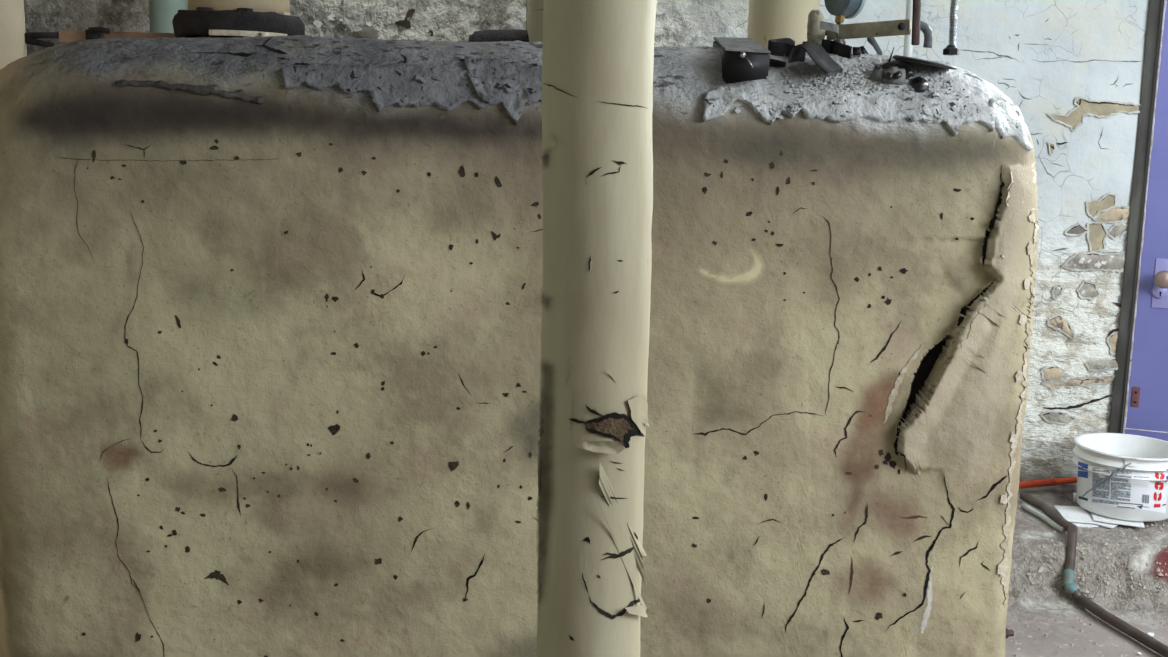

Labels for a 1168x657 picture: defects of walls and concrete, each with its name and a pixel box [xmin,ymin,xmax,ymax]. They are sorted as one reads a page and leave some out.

crack [69,145,269,261]
damp [26,101,324,131]
peeling [263,7,543,124]
crack [544,83,648,109]
crack [586,160,627,178]
crack [695,132,1005,466]
peeling [703,76,1075,606]
peeling [1051,193,1130,300]
peeling [1047,97,1141,156]
crack [100,214,164,656]
crack [190,455,241,516]
crack [762,474,1007,657]